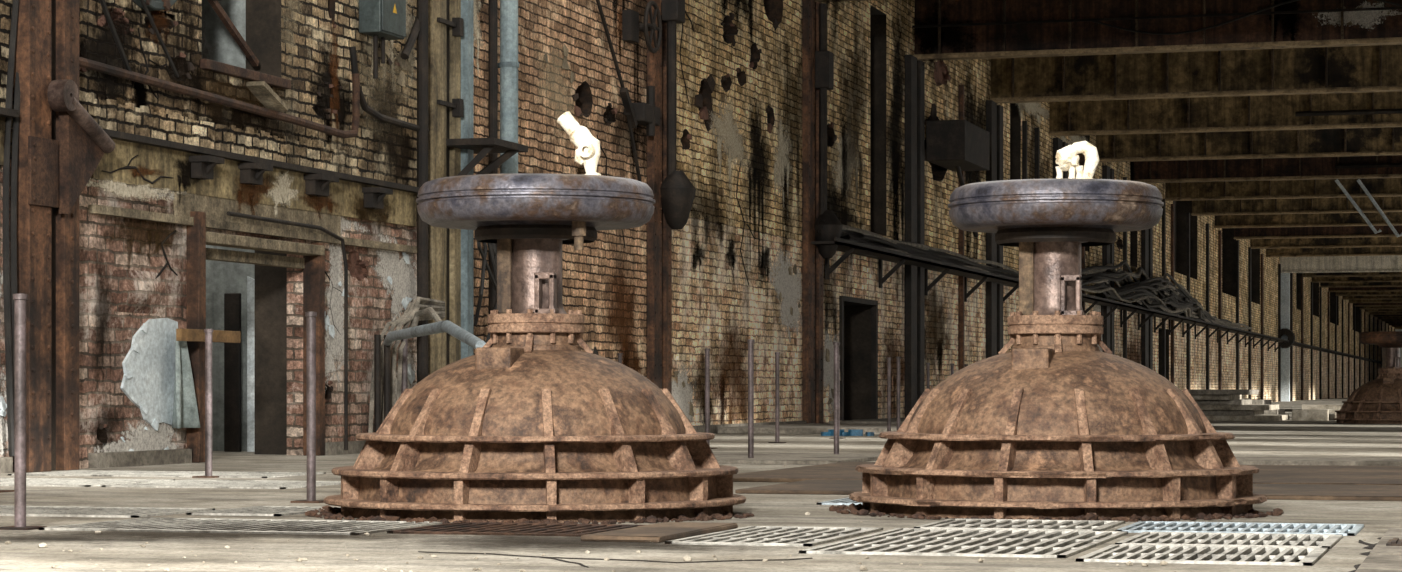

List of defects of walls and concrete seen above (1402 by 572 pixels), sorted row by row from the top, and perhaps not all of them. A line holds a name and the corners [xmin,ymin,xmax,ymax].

leakage [722,0,753,52]
leakage [711,106,799,295]
leakage [693,210,723,283]
peeling [0,368,8,455]
peeling [94,318,179,453]